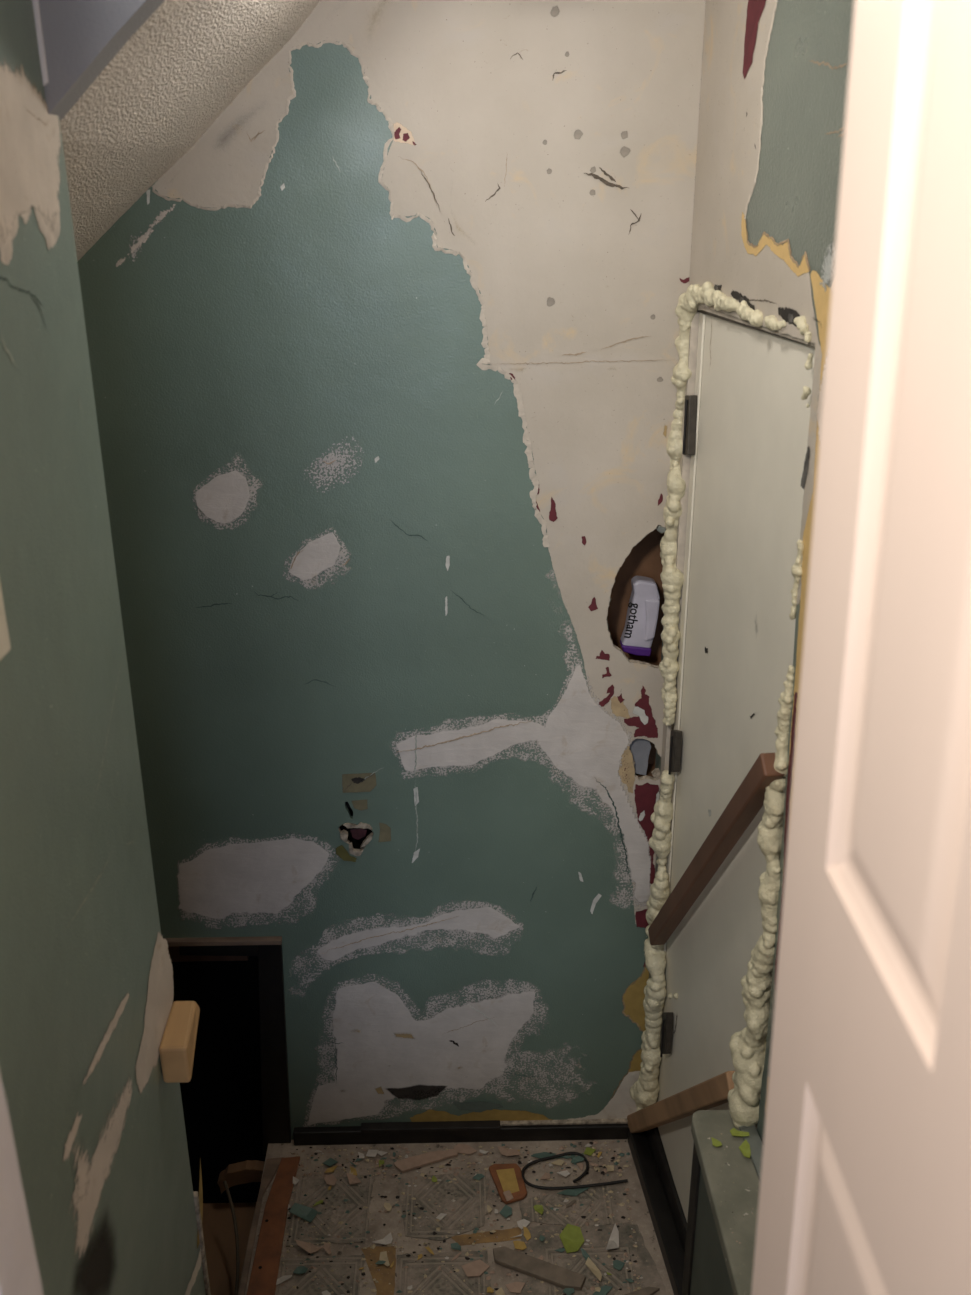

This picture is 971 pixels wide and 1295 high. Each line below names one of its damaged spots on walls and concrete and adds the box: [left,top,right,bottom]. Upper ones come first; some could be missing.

peeling [151,0,832,924]